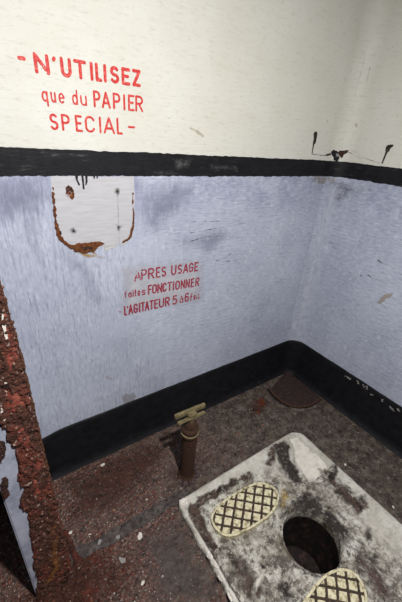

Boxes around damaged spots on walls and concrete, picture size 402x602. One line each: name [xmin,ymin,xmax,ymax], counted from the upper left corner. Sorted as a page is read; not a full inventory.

rust [52,187,105,254]
peeling [50,176,135,249]
rust [0,279,73,600]